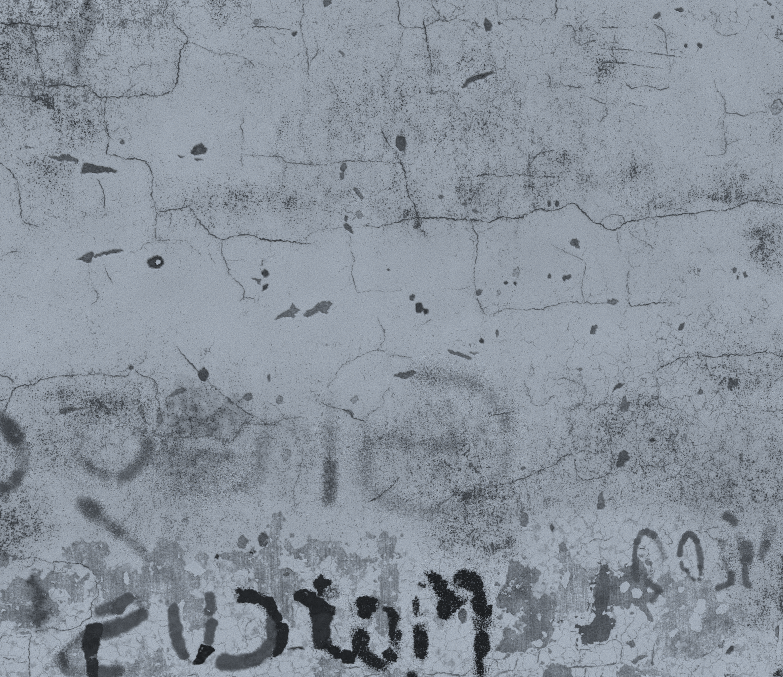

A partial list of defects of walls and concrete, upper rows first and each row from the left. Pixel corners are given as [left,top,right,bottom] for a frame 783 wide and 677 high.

spalling [54,155,116,173]
crack [0,0,783,315]
spalling [79,250,121,263]
spalling [277,302,332,319]
crack [0,356,302,443]
crack [321,320,412,438]
crack [637,351,783,410]
crack [0,557,99,676]
peeling [112,634,175,677]
peeling [0,512,403,637]
crack [569,623,655,677]
peeling [495,543,748,677]